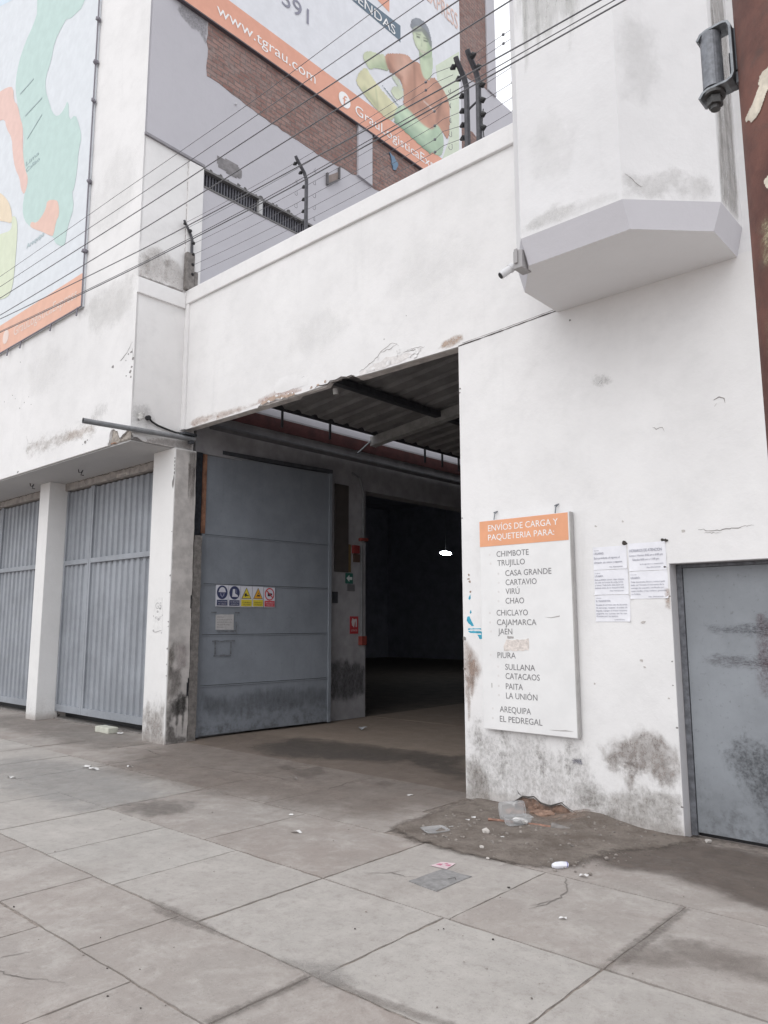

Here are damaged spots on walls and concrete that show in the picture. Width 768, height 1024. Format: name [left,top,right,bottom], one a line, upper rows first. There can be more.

flaking render [206,22,357,175]
peeling [310,347,421,389]
damp [466,653,479,684]
damp [142,649,185,744]
mould [608,735,675,785]
flaking render [505,797,586,829]
crack [533,878,568,908]